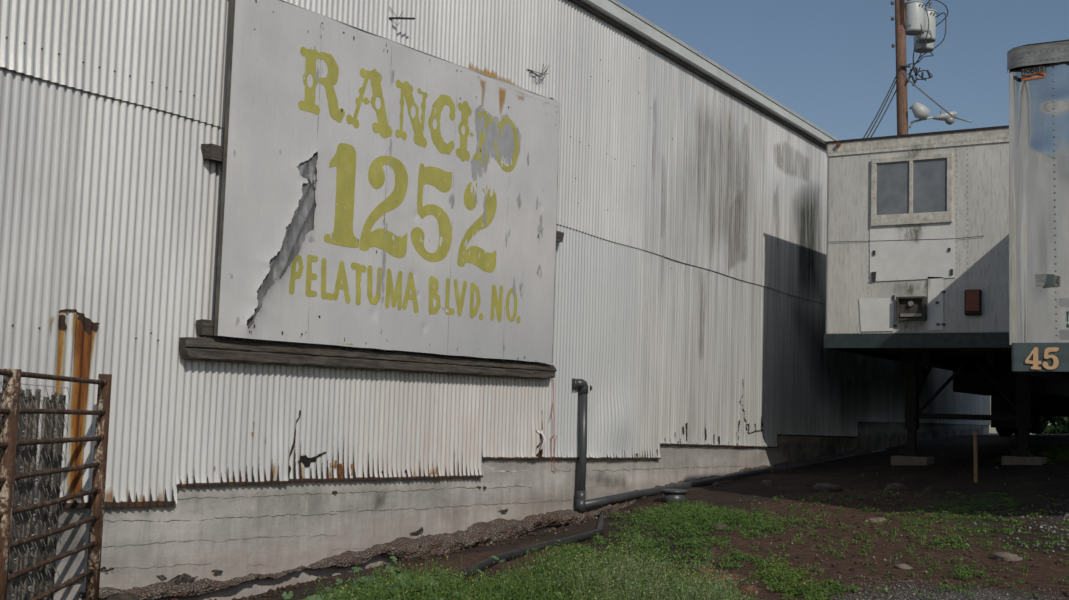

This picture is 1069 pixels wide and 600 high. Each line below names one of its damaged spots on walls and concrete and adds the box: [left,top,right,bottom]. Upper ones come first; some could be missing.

corrosion [470,65,514,110]
water stain [800,198,816,284]
corrosion [51,309,100,509]
water stain [814,336,905,401]
corrosion [104,423,857,508]